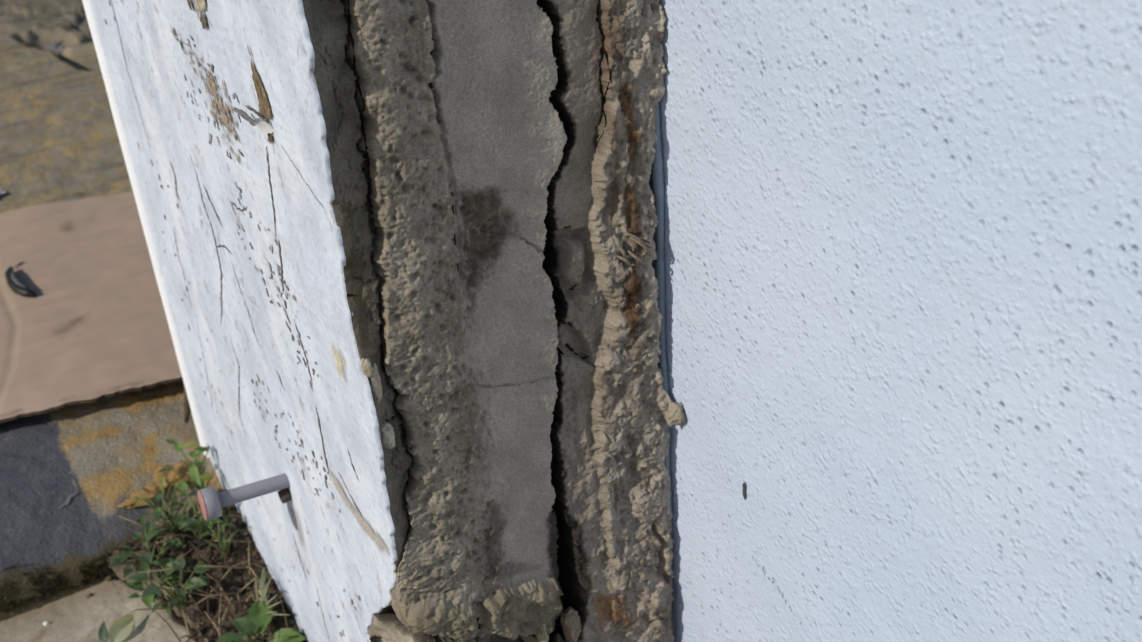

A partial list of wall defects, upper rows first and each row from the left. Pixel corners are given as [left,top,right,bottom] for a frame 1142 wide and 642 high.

peeling [187,0,208,30]
spalling [171,28,275,163]
crack [347,0,376,235]
corrosion [620,85,641,162]
crack [111,2,328,449]
crack [295,325,362,516]
crack [347,294,413,484]
spalling [302,0,674,642]
crack [472,0,612,639]
corrosion [625,188,640,250]
corrosion [626,268,643,336]